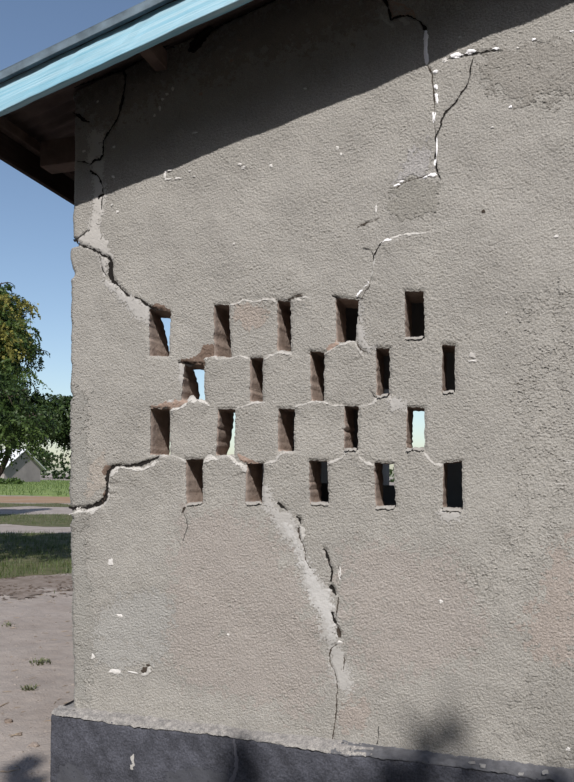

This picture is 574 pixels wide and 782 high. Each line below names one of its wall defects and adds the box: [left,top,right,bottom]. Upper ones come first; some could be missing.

crack [383,0,427,30]
crack [74,58,144,210]
crack [397,49,502,188]
crack [73,229,156,311]
crack [69,456,160,510]
crack [277,502,345,739]